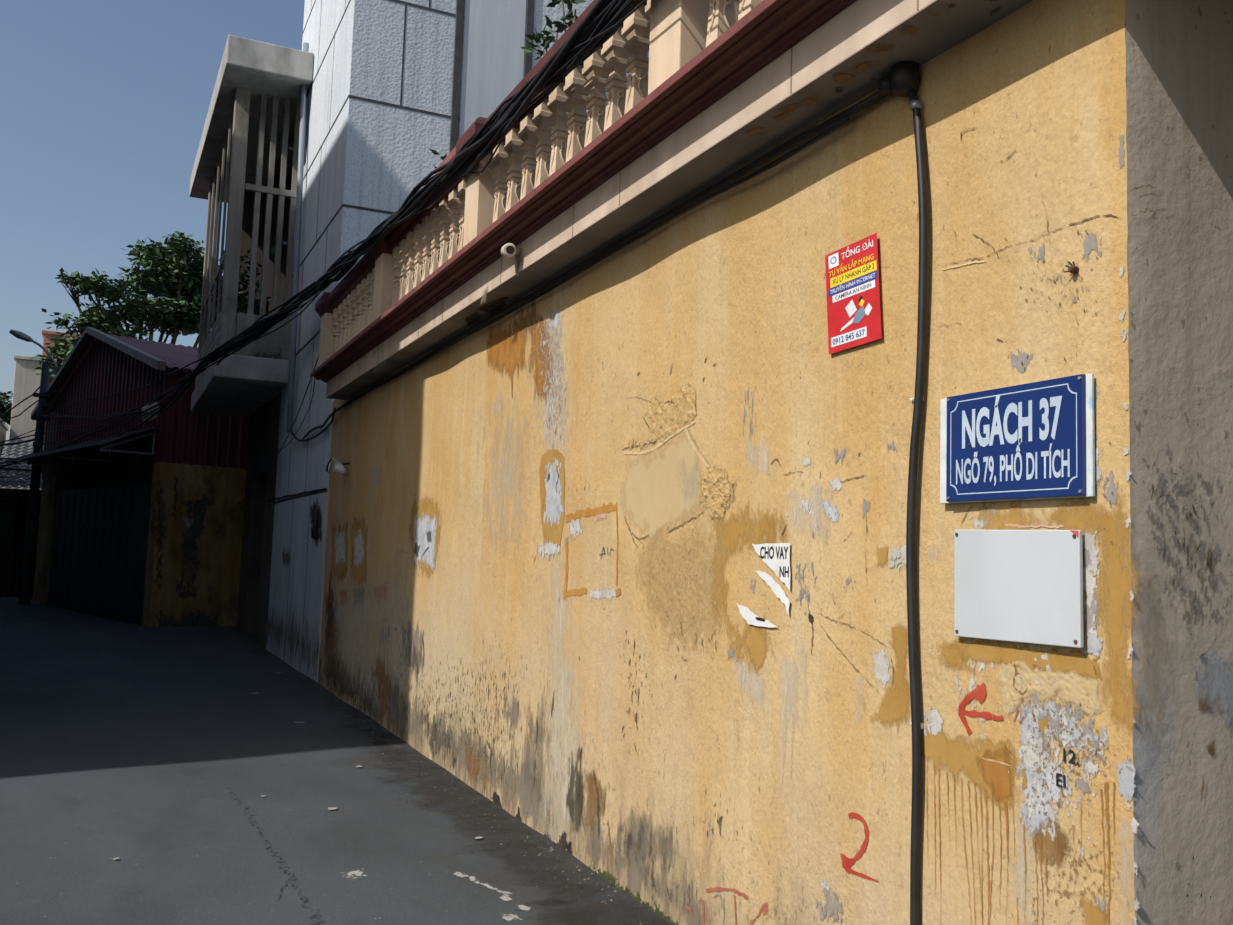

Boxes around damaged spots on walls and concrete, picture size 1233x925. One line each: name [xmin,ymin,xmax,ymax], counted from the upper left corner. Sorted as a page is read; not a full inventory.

crack [942,184,1167,270]
peeling [412,511,437,571]
peeling [536,518,582,560]
water stain [259,571,703,925]
peeling [922,645,1139,833]
crack [225,787,325,925]
rust [921,728,1082,925]
rust [1100,782,1115,925]